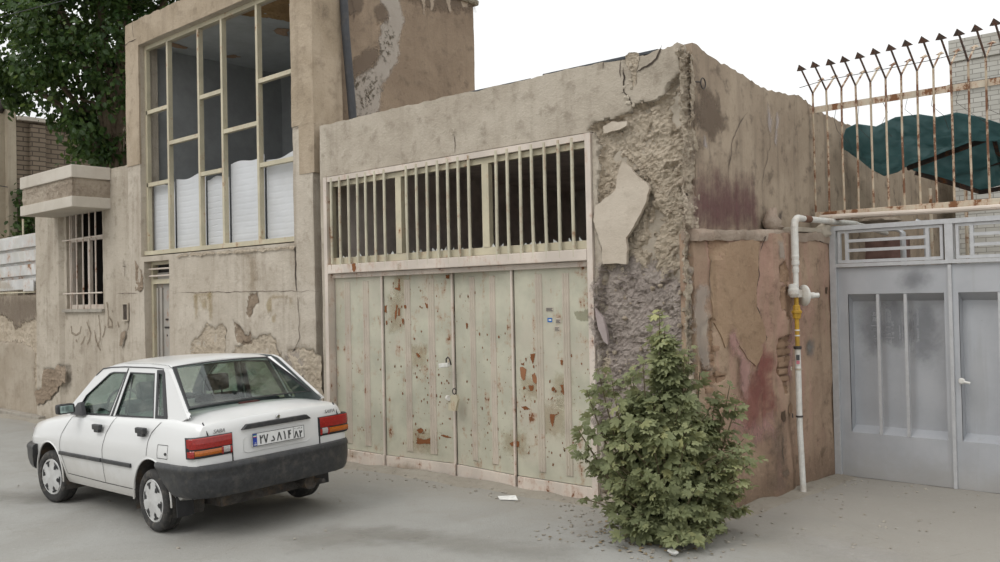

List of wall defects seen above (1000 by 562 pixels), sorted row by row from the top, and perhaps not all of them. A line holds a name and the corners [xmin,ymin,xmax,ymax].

damp [696,89,725,146]
damp [694,175,756,230]
flaking render [588,45,727,459]
flaking render [246,292,259,318]
corrosion [384,275,449,327]
flaking render [0,314,66,405]
flaking render [191,322,324,400]
corrosion [394,347,451,448]
corrosion [519,353,537,417]
flaking render [776,335,790,393]
corrosion [462,412,583,466]